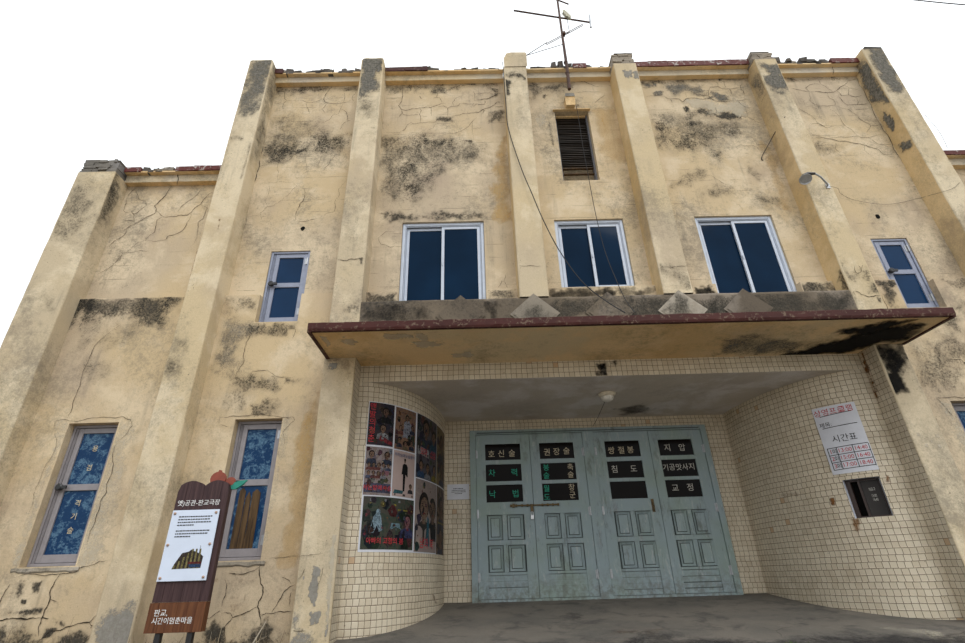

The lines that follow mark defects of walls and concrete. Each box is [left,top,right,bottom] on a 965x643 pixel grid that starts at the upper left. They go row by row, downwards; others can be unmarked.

leakage [239,60,332,116]
leakage [266,117,341,163]
leakage [382,137,479,198]
leakage [643,79,741,155]
crack [793,67,902,161]
crack [104,175,209,271]
leakage [71,297,180,327]
leakage [868,278,896,306]
crack [28,332,132,538]
crack [0,561,103,640]
crack [207,553,324,636]
peeling [291,566,330,643]